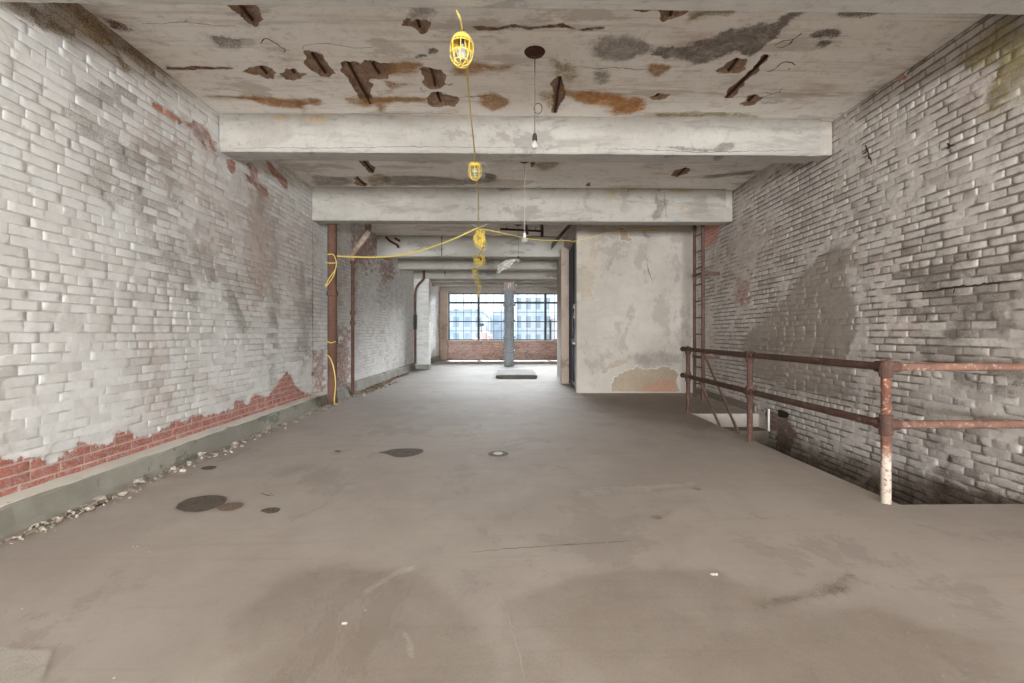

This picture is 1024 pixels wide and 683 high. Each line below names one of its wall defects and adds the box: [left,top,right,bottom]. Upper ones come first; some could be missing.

spalling [227,5,264,27]
rust [203,93,328,124]
spalling [243,50,397,104]
spalling [420,67,459,107]
spalling [550,76,566,113]
rust [538,57,759,118]
leakage [588,12,805,84]
spalling [715,54,771,106]
leakage [952,15,1024,122]
peeling [152,100,288,197]
leakage [742,244,874,425]
peeling [0,322,351,497]